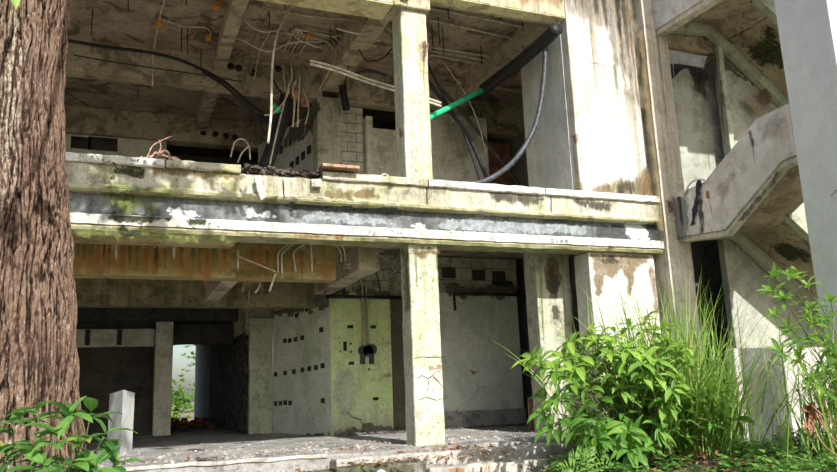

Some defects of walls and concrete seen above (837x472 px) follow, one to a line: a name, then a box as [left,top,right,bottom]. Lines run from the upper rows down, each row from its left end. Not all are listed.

damp [574,0,654,144]
peeling [167,207,200,219]
peeling [242,205,276,218]
damp [574,169,653,211]
rust [74,243,332,279]
damp [540,257,574,335]
damp [590,254,659,313]
crack [415,356,444,401]